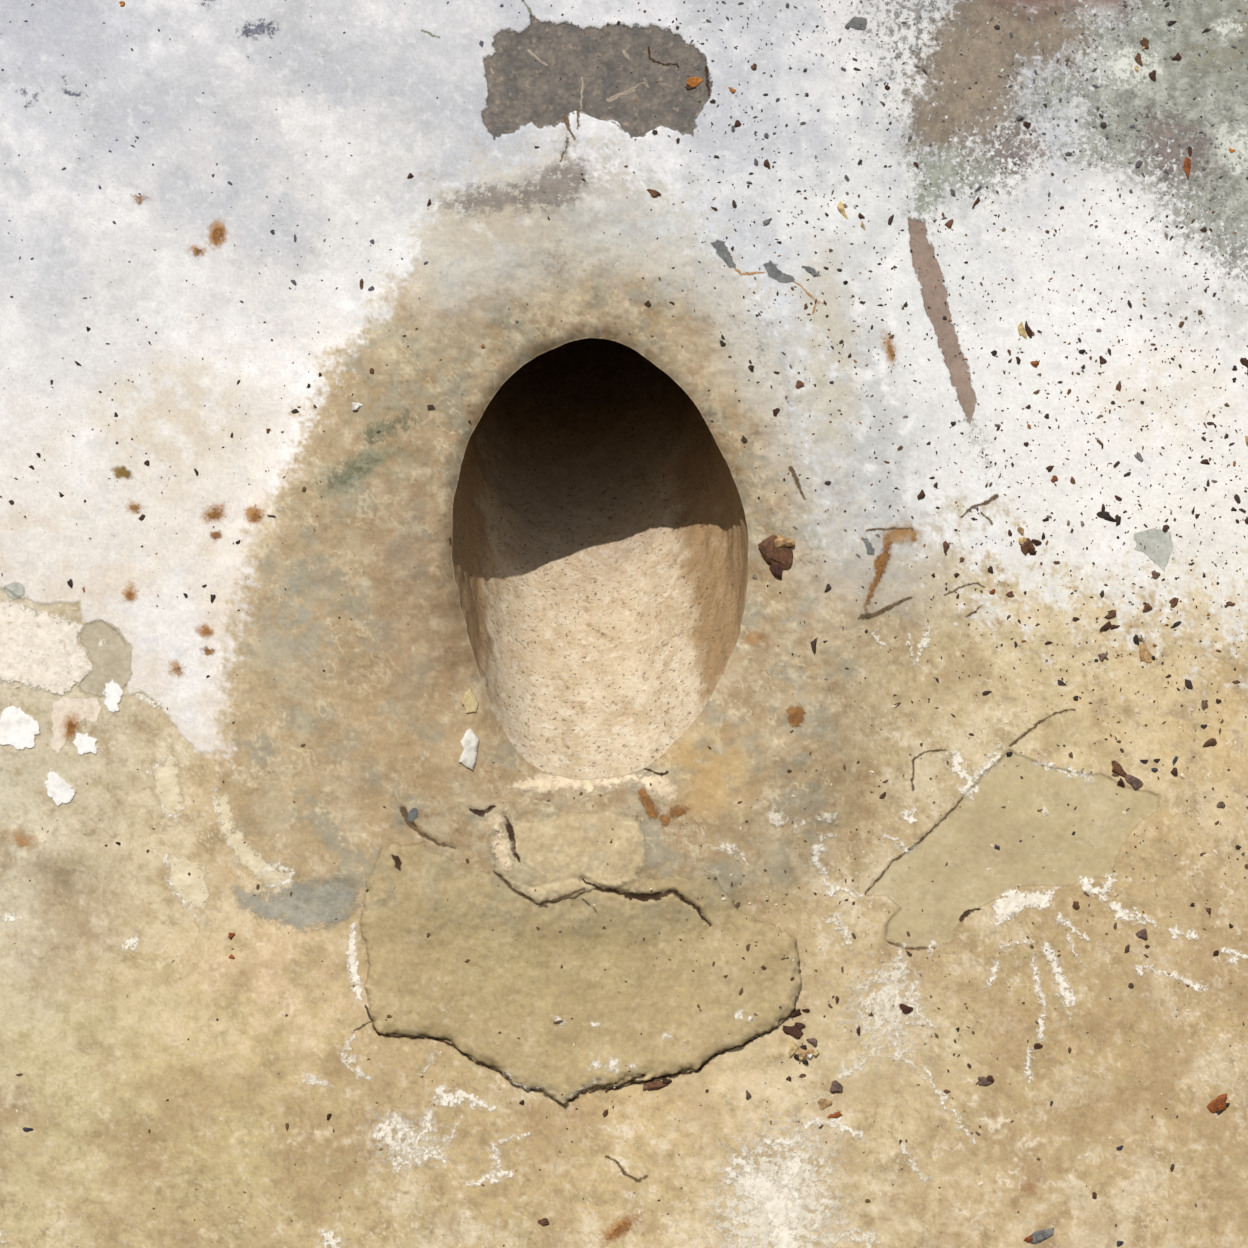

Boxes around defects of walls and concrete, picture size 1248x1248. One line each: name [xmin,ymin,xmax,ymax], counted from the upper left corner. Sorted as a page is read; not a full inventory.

spalling [481,15,715,140]
peeling [0,582,161,806]
crack [911,749,945,790]
crack [1009,709,1076,747]
crack [400,807,455,849]
crack [469,805,711,927]
damp [991,886,1090,967]
damp [1079,873,1199,940]
crack [353,998,799,1106]
damp [984,940,1076,1084]
damp [702,1110,881,1248]
damp [317,1229,341,1248]